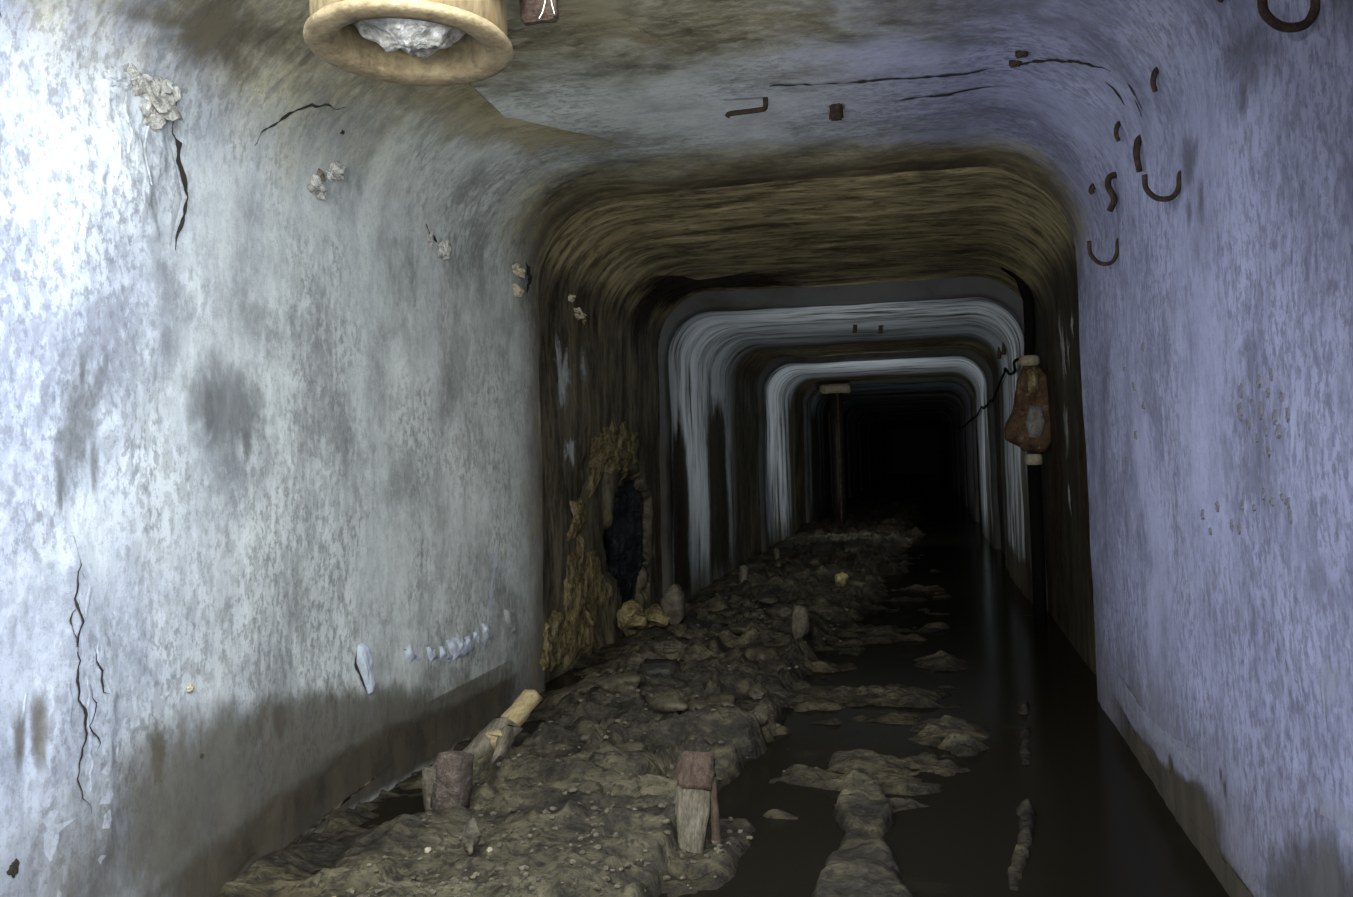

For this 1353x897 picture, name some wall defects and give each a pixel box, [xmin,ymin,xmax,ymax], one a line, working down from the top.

crack [254,103,347,146]
peeling [555,341,586,405]
spalling [539,420,640,672]
damp [16,702,46,760]
crack [69,538,110,814]
damp [111,671,512,897]
damp [1120,709,1353,897]